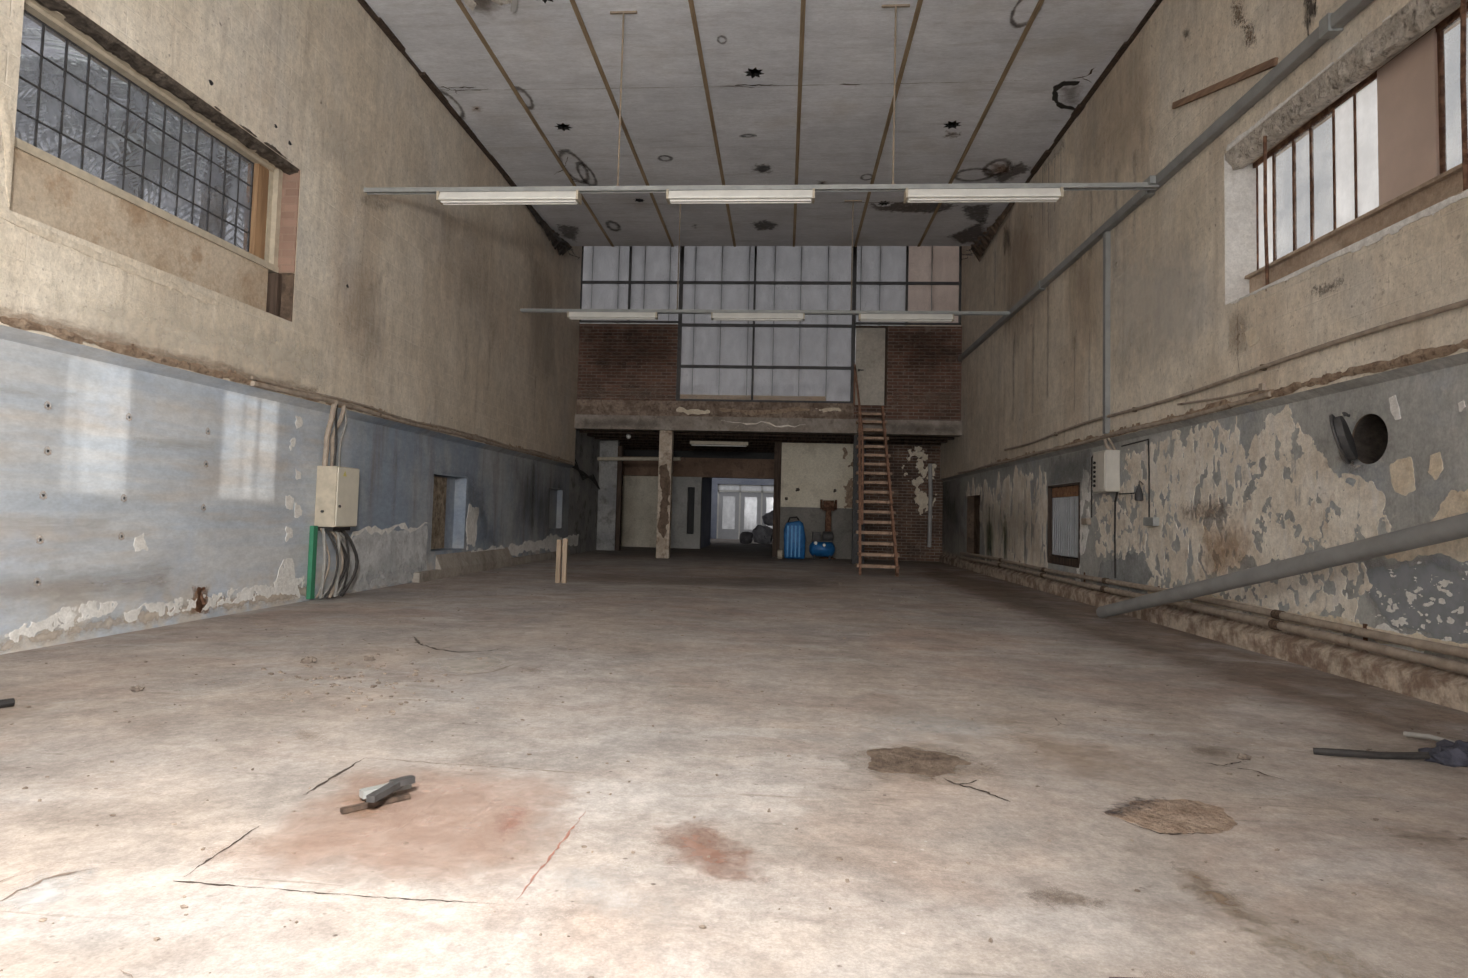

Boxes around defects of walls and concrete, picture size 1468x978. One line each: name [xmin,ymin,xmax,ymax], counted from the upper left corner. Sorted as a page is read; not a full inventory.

peeling [1231,3,1255,45]
flaking render [1226,15,1391,151]
spalling [0,316,569,462]
peeling [5,469,305,643]
peeling [340,525,428,594]
peeling [466,504,579,557]
peeling [902,446,937,518]
peeling [966,339,1468,653]
corrosion [191,587,209,614]
crack [305,757,583,795]
crack [177,813,585,904]
damp [675,828,750,878]